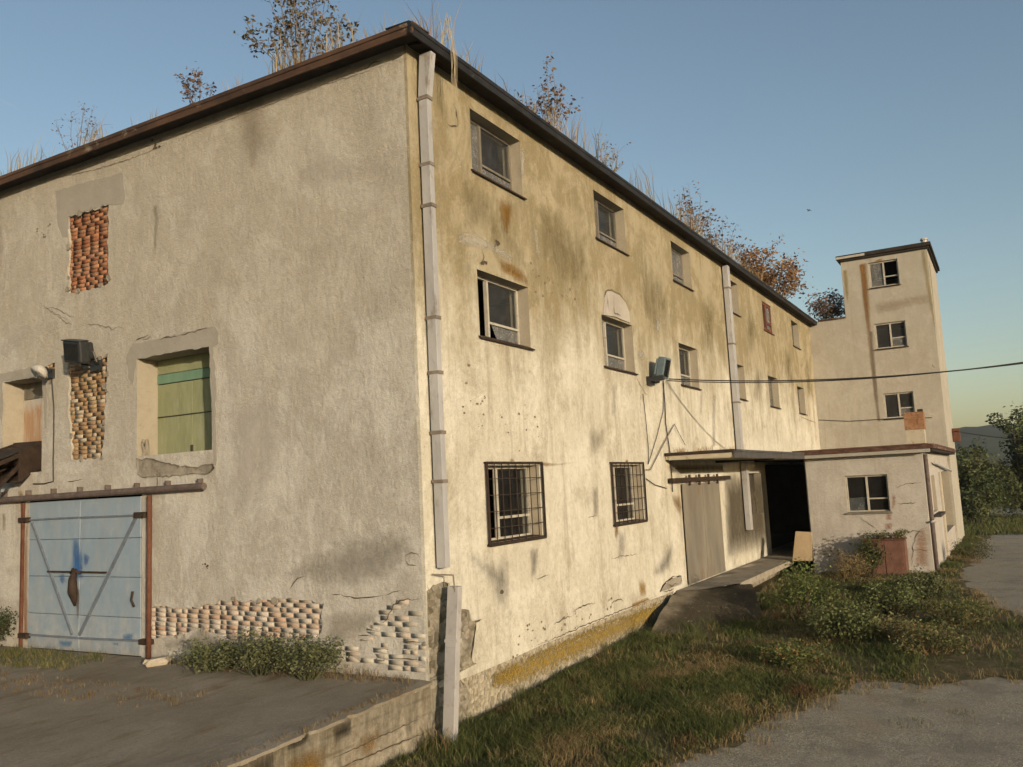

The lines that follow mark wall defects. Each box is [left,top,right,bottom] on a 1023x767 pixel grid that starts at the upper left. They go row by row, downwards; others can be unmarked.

flaking render [65,206,111,294]
rust [861,265,870,331]
flaking render [69,353,109,462]
flaking render [152,596,324,643]
crack [333,591,420,661]
flaking render [341,582,448,681]
spalling [460,609,500,667]